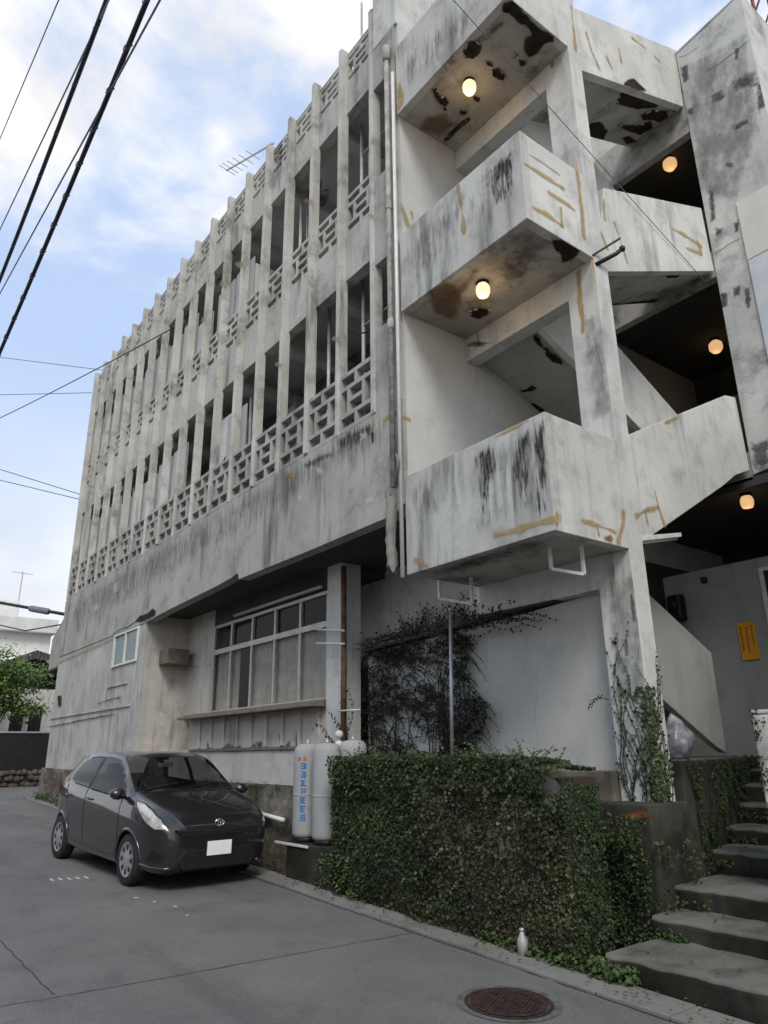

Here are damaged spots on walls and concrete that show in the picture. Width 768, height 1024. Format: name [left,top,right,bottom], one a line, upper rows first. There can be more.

spalling [502,1,554,67]
spalling [432,88,470,141]
spalling [589,78,682,144]
water stain [491,153,512,200]
spalling [551,240,580,263]
water stain [432,284,466,317]
spalling [468,308,491,319]
spalling [533,334,563,366]
water stain [339,410,411,447]
water stain [475,419,561,538]
water stain [582,491,666,544]